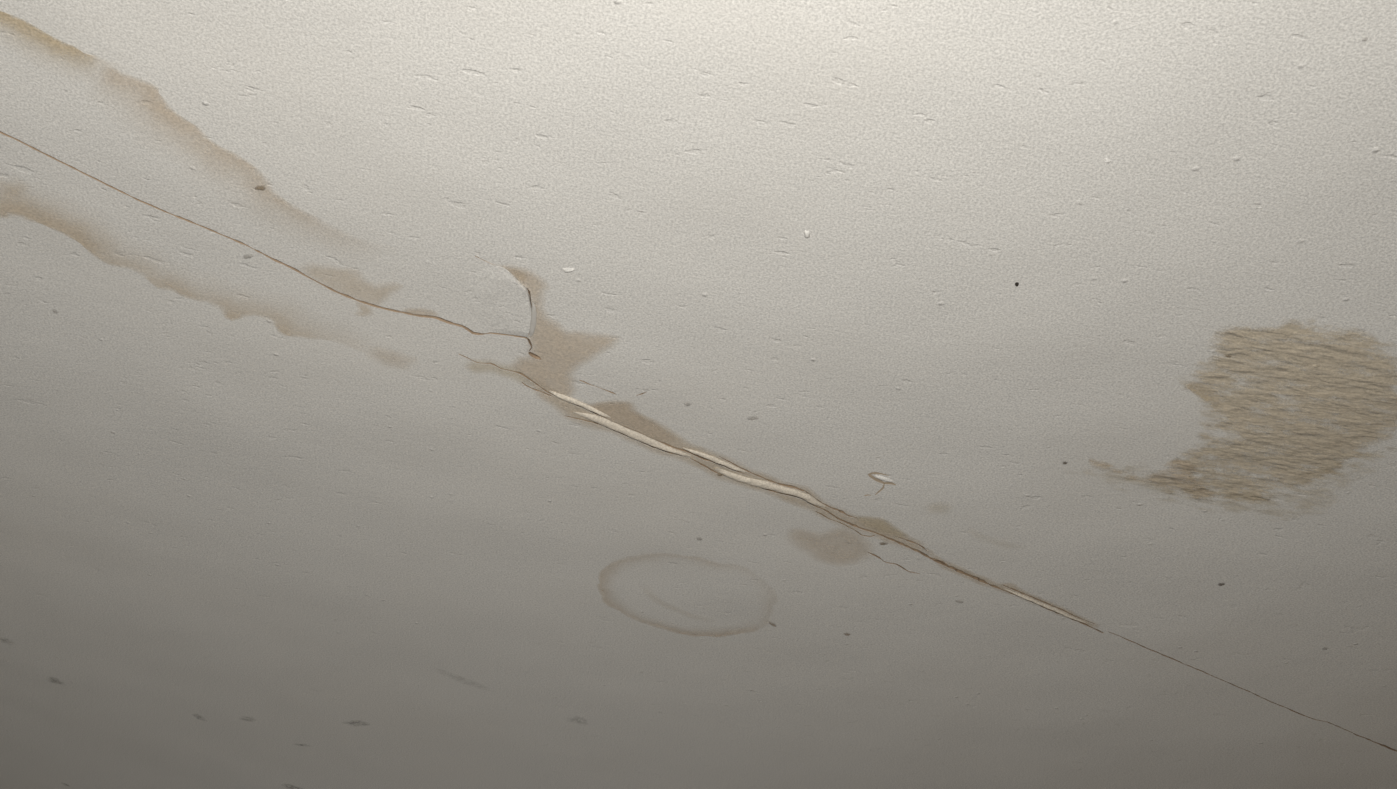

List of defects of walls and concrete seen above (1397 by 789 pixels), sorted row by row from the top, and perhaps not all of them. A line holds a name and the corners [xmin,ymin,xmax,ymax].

water stain [0,11,83,55]
water stain [0,203,93,248]
crack [0,131,1397,752]
water stain [1175,324,1397,500]